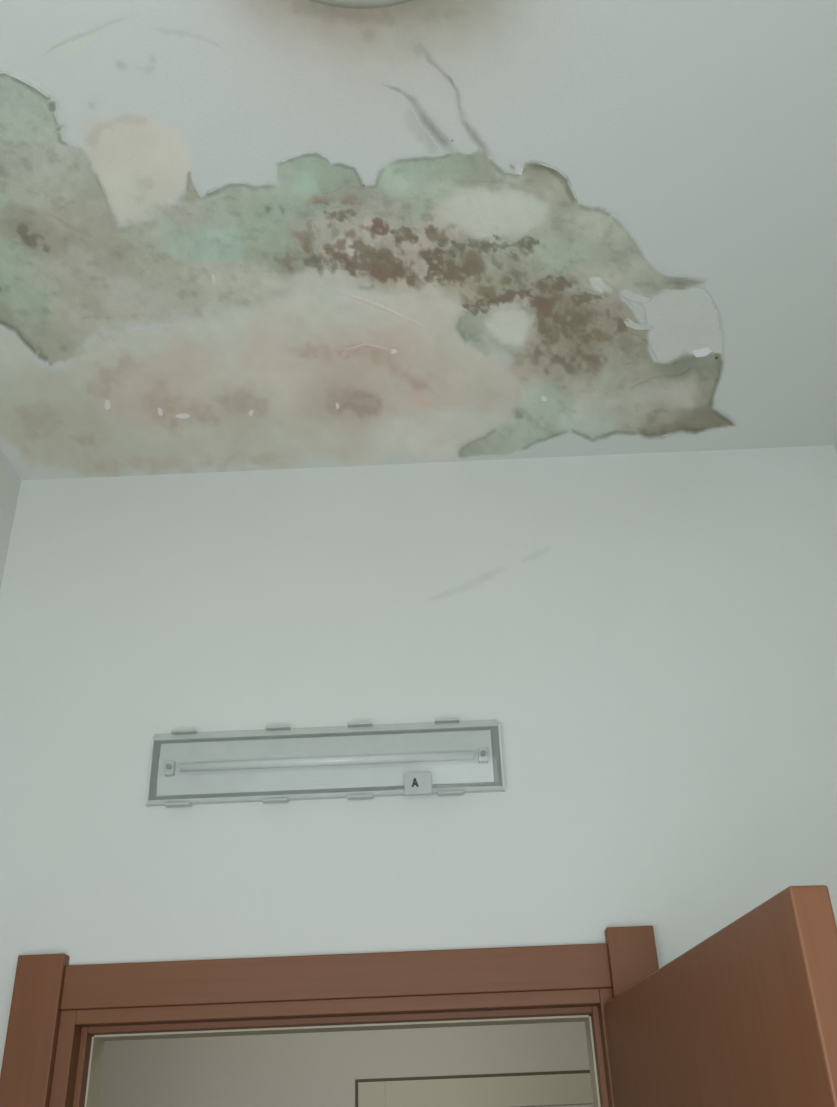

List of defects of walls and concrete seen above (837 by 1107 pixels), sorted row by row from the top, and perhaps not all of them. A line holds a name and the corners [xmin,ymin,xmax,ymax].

leakage [75,102,201,219]
crack [380,40,501,168]
leakage [1,211,89,272]
peeling [0,65,737,461]
leakage [0,291,518,512]